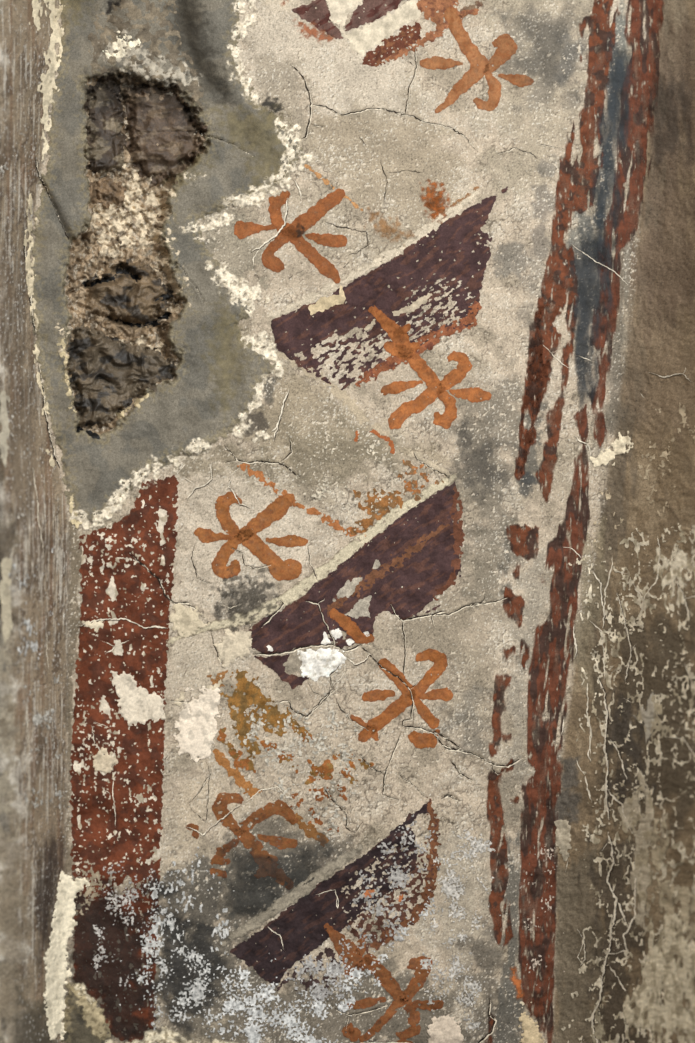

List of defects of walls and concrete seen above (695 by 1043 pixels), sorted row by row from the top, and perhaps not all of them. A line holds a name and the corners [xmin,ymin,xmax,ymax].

crack [290,50,565,200]
spalling [54,75,208,439]
crack [414,452,450,484]
crack [76,618,166,654]
crack [130,545,521,801]
crack [187,761,289,836]
crack [324,788,363,834]
damp [91,814,496,1043]